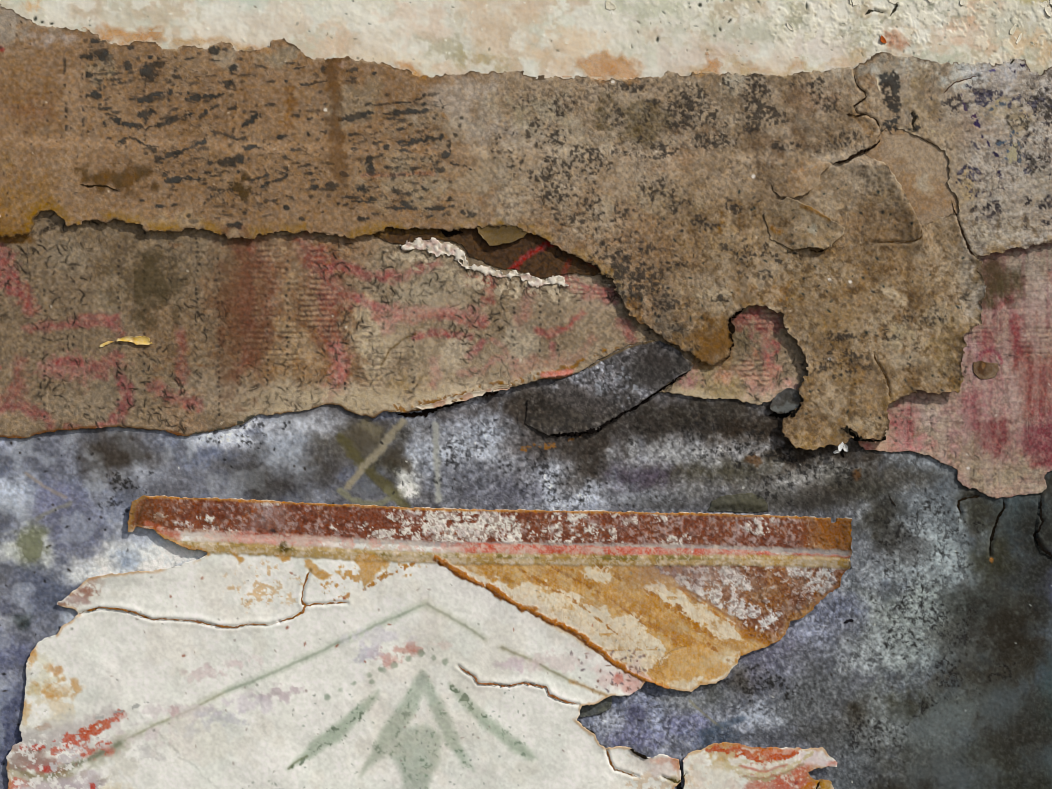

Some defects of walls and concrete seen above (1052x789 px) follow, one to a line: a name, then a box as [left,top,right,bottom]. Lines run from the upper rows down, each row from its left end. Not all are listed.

crack [834,70,882,164]
crack [951,201,975,256]
spalling [399,237,569,287]
water stain [814,330,900,379]
peeling [416,384,512,410]
peeling [525,340,693,435]
water stain [499,451,600,506]
water stain [682,412,859,506]
crack [79,571,347,628]
water stain [846,517,984,758]
crack [459,666,685,789]
peeling [579,696,612,717]